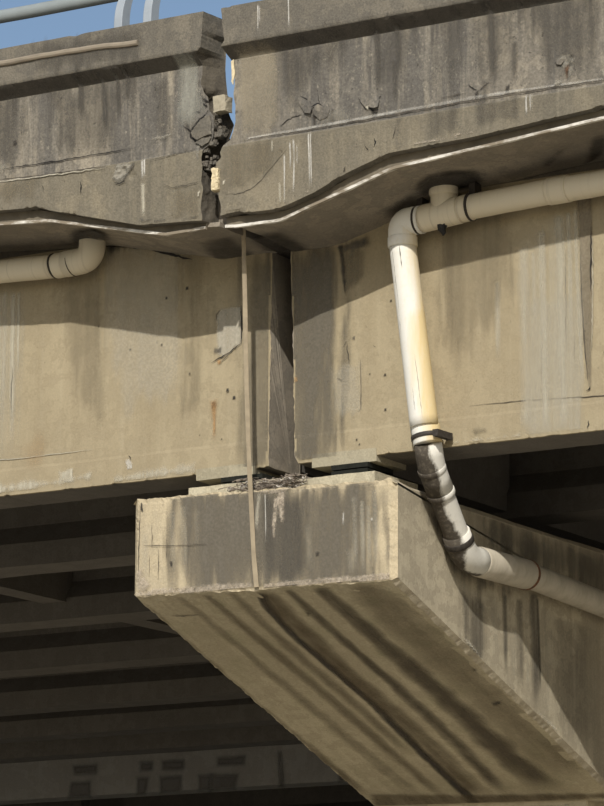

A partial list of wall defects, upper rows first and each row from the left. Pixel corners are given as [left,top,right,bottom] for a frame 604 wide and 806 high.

crack [152,99,212,160]
damp [255,236,334,460]
damp [170,482,604,806]